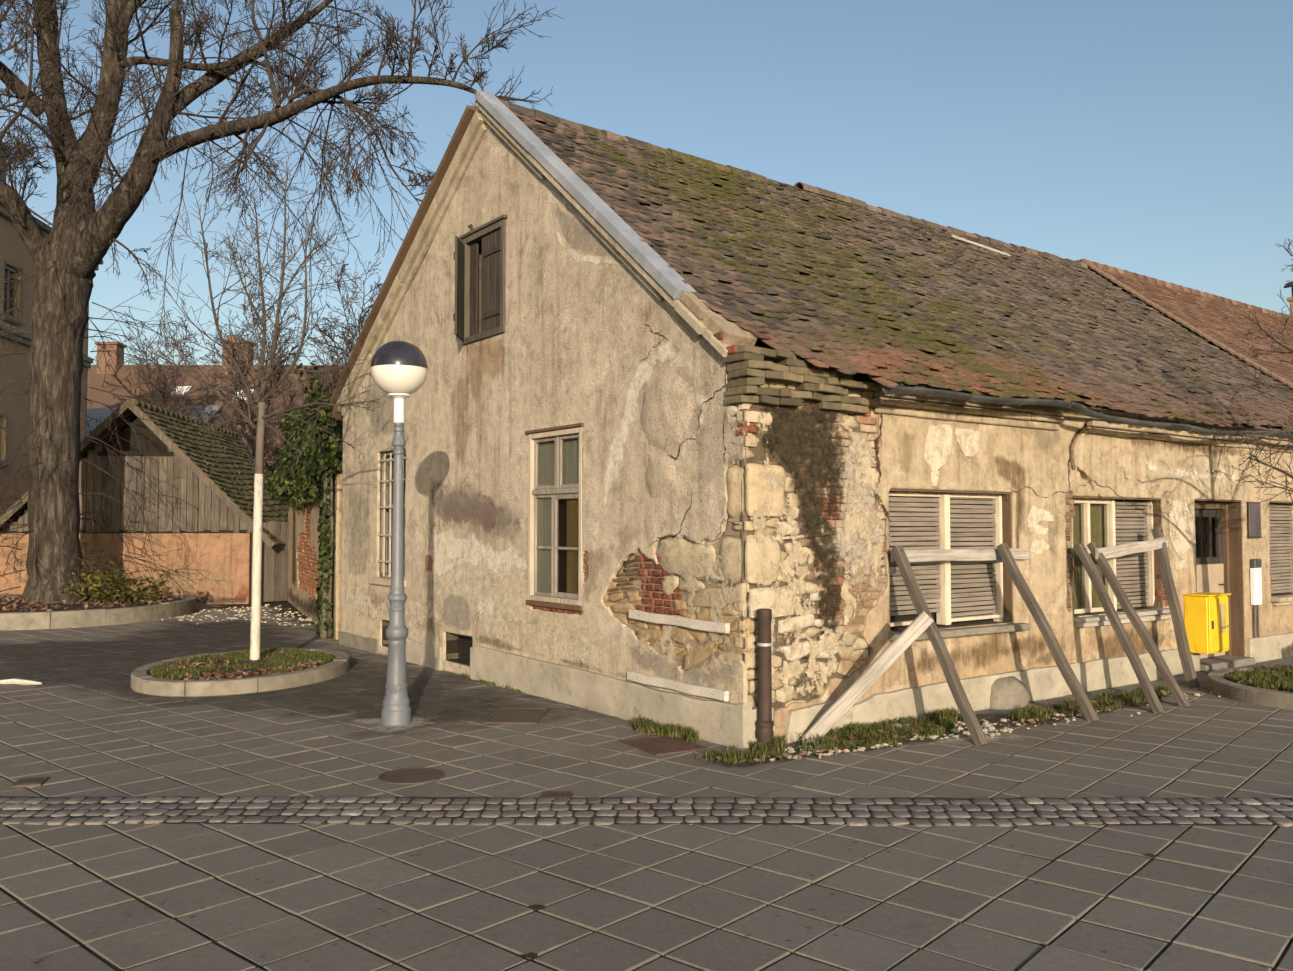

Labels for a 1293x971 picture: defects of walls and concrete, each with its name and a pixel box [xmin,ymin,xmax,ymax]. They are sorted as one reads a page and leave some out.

flaking render [297,507,319,603]
damp [432,485,520,538]
crack [651,496,740,586]
crack [668,365,727,461]
flaking render [603,362,896,707]
peeling [923,424,980,486]
peeling [1028,491,1076,612]
crack [1010,420,1182,535]